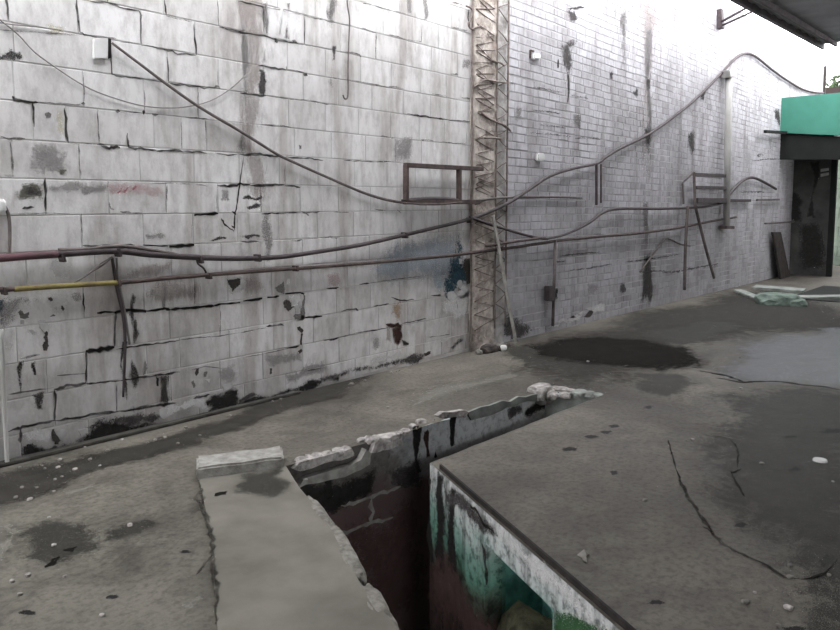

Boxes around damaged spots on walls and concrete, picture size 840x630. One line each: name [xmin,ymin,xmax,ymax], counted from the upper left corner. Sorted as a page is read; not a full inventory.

crack [1,0,329,247]
water stain [228,0,270,204]
water stain [557,40,579,103]
water stain [633,0,660,305]
water stain [20,278,204,456]
crack [8,350,217,443]
crack [82,292,304,349]
rust [385,302,409,346]
crack [702,371,840,390]
water stain [296,425,498,630]
spalling [286,391,636,630]
crack [668,436,832,580]